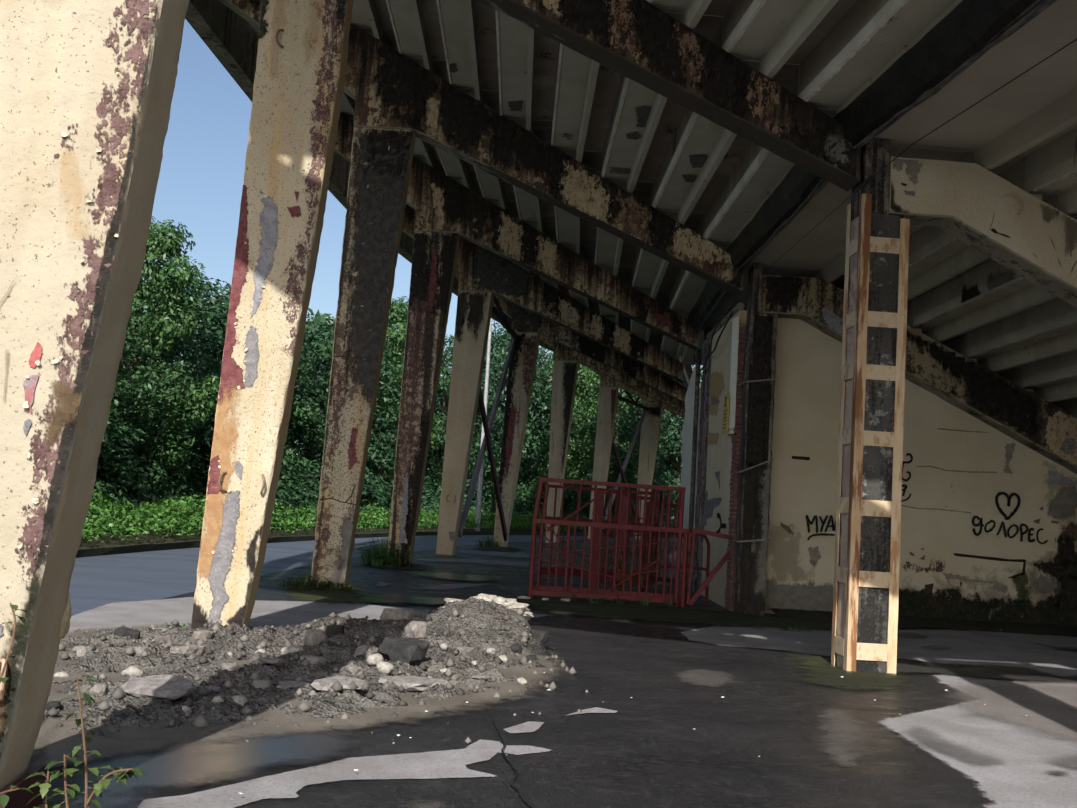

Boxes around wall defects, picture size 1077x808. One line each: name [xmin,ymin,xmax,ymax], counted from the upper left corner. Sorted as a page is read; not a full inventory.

peeling [217,0,347,404]
peeling [15,0,157,589]
spalling [207,455,243,626]
water stain [898,523,1077,626]
spalling [1034,470,1077,524]
peeling [1044,411,1077,465]